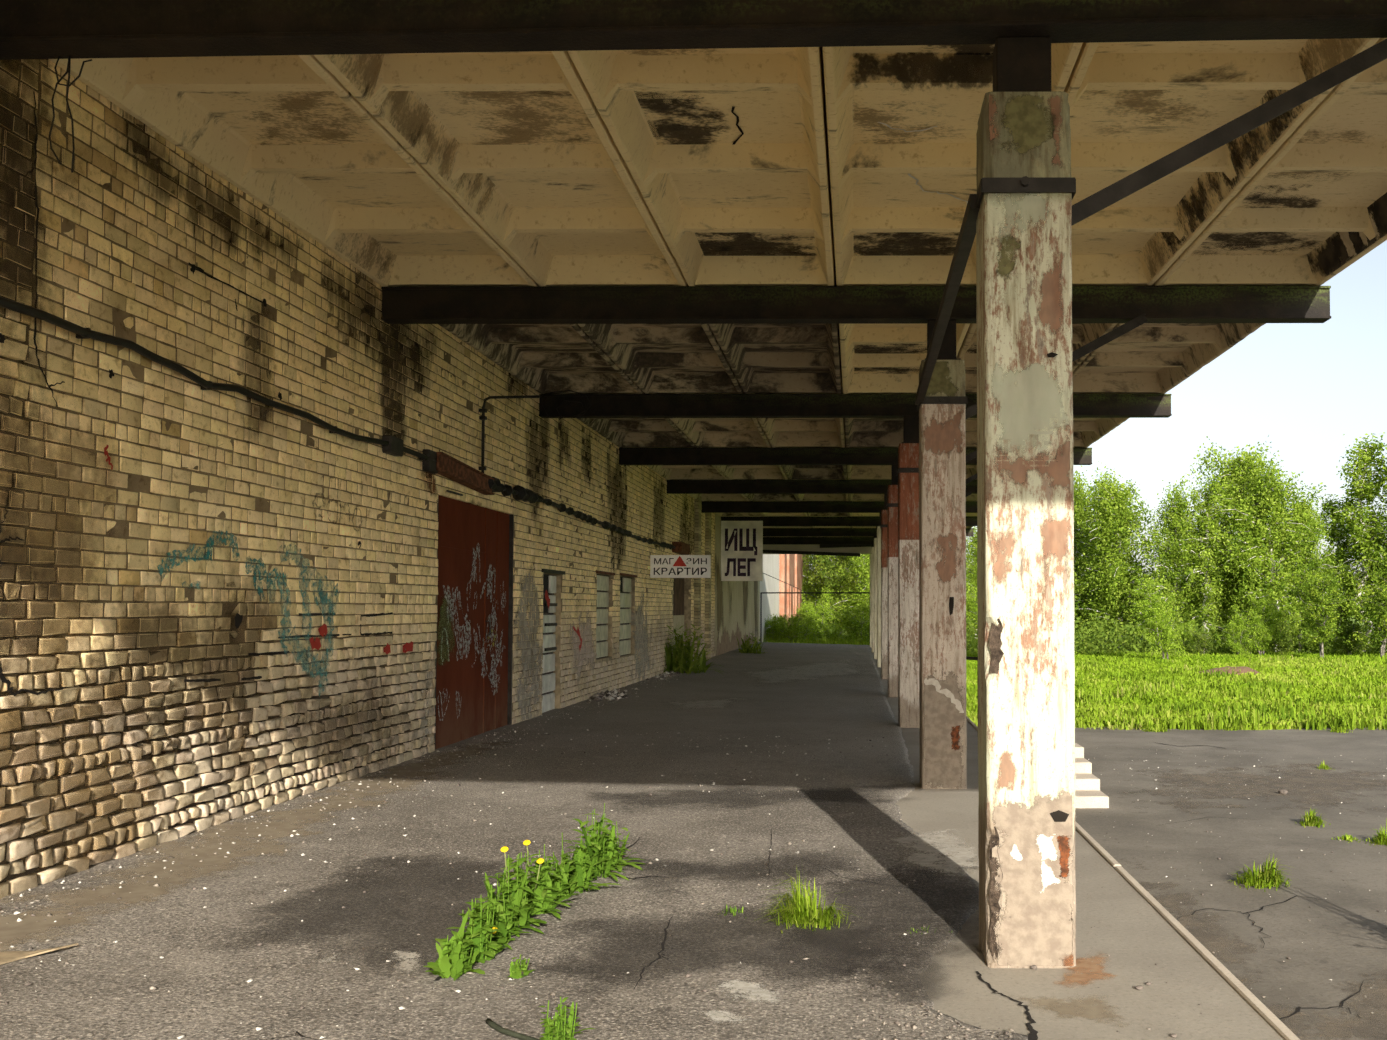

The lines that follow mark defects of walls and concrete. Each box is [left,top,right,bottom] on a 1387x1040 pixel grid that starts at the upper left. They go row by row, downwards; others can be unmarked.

damp [853,44,994,89]
damp [635,92,728,145]
crack [731,106,744,145]
damp [695,232,816,256]
damp [853,232,960,256]
peeling [1035,252,1063,334]
peeling [995,424,1071,579]
spalling [989,619,1004,674]
crack [0,666,67,696]
peeling [989,752,1073,966]
crack [634,917,672,989]
crack [976,971,1038,1040]